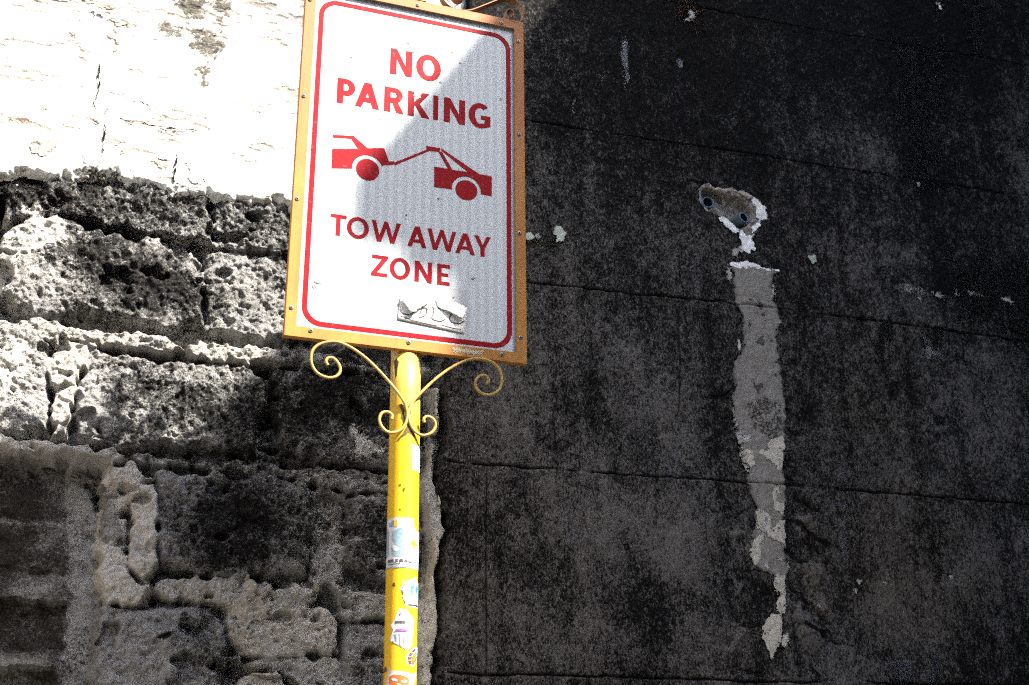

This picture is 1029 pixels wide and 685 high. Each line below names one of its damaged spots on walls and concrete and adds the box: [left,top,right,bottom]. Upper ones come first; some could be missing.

peeling [86,0,137,51]
peeling [30,138,58,156]
spalling [698,183,768,238]
peeling [732,407,785,472]
peeling [750,487,790,659]